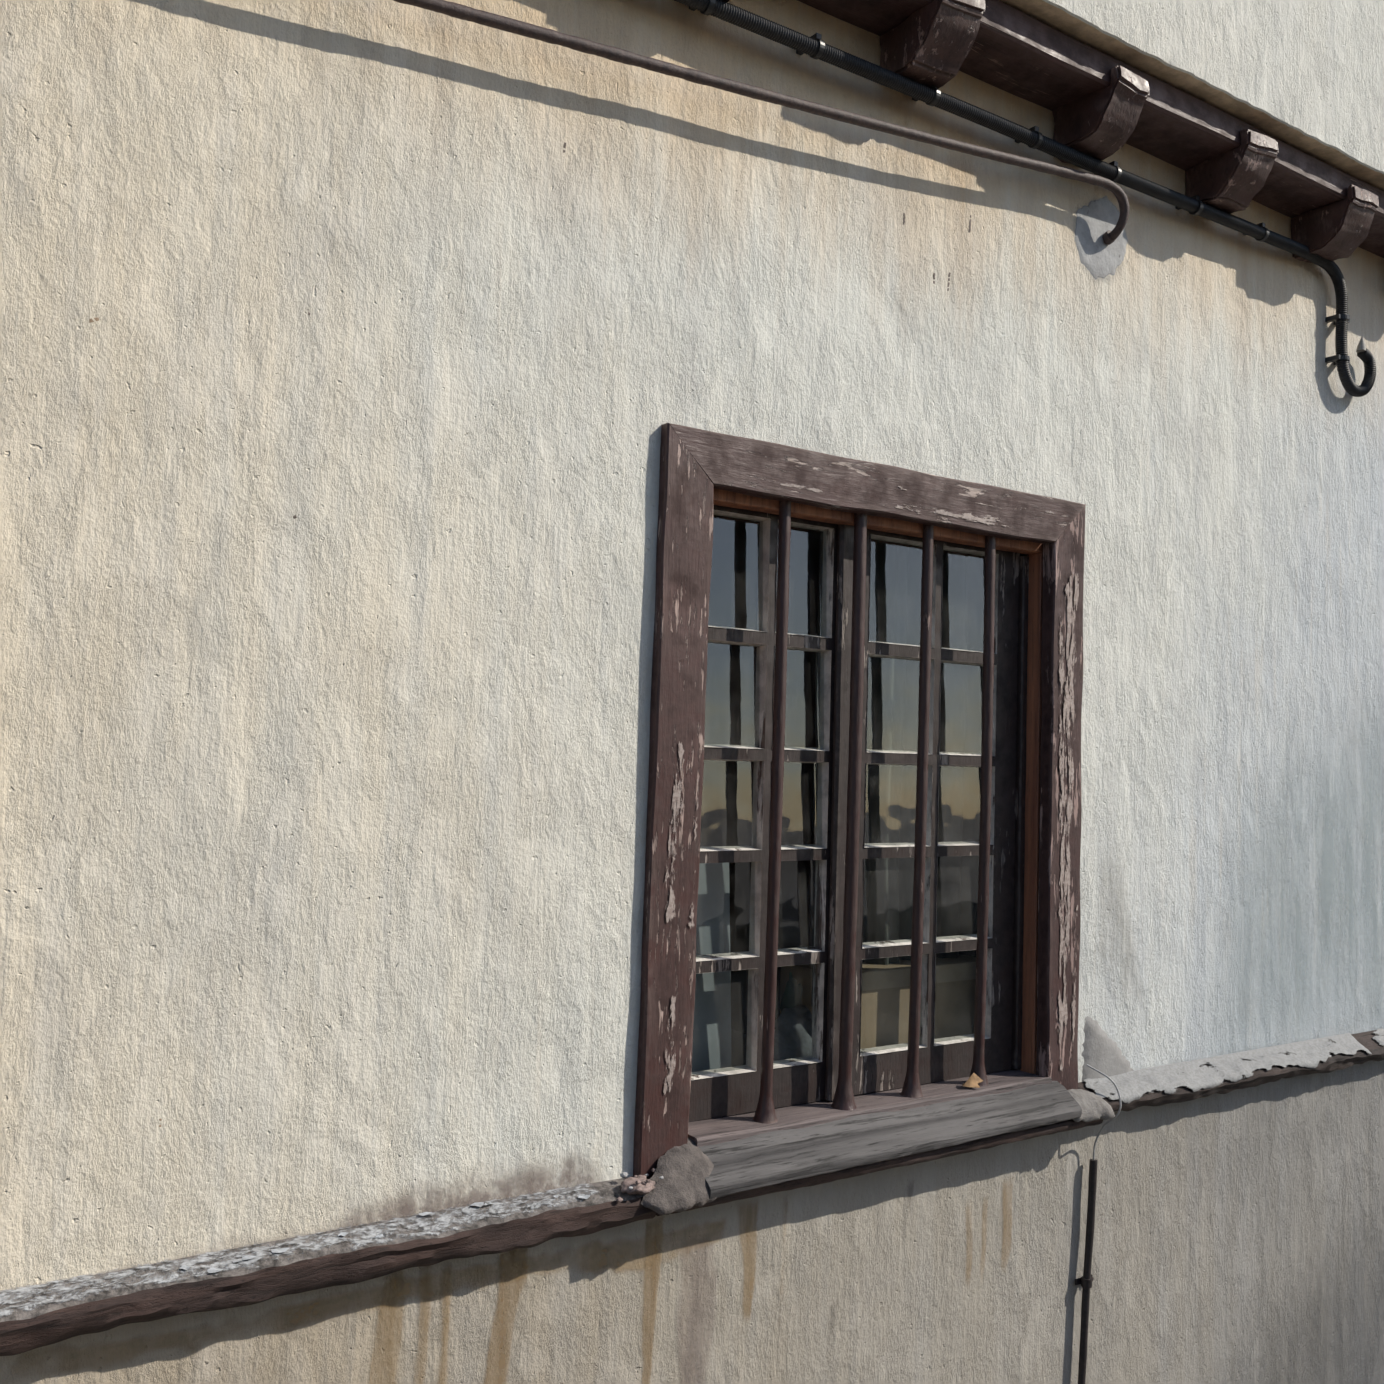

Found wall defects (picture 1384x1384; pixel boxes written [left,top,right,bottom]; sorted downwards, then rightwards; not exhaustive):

spalling [1084,1028,1384,1104]